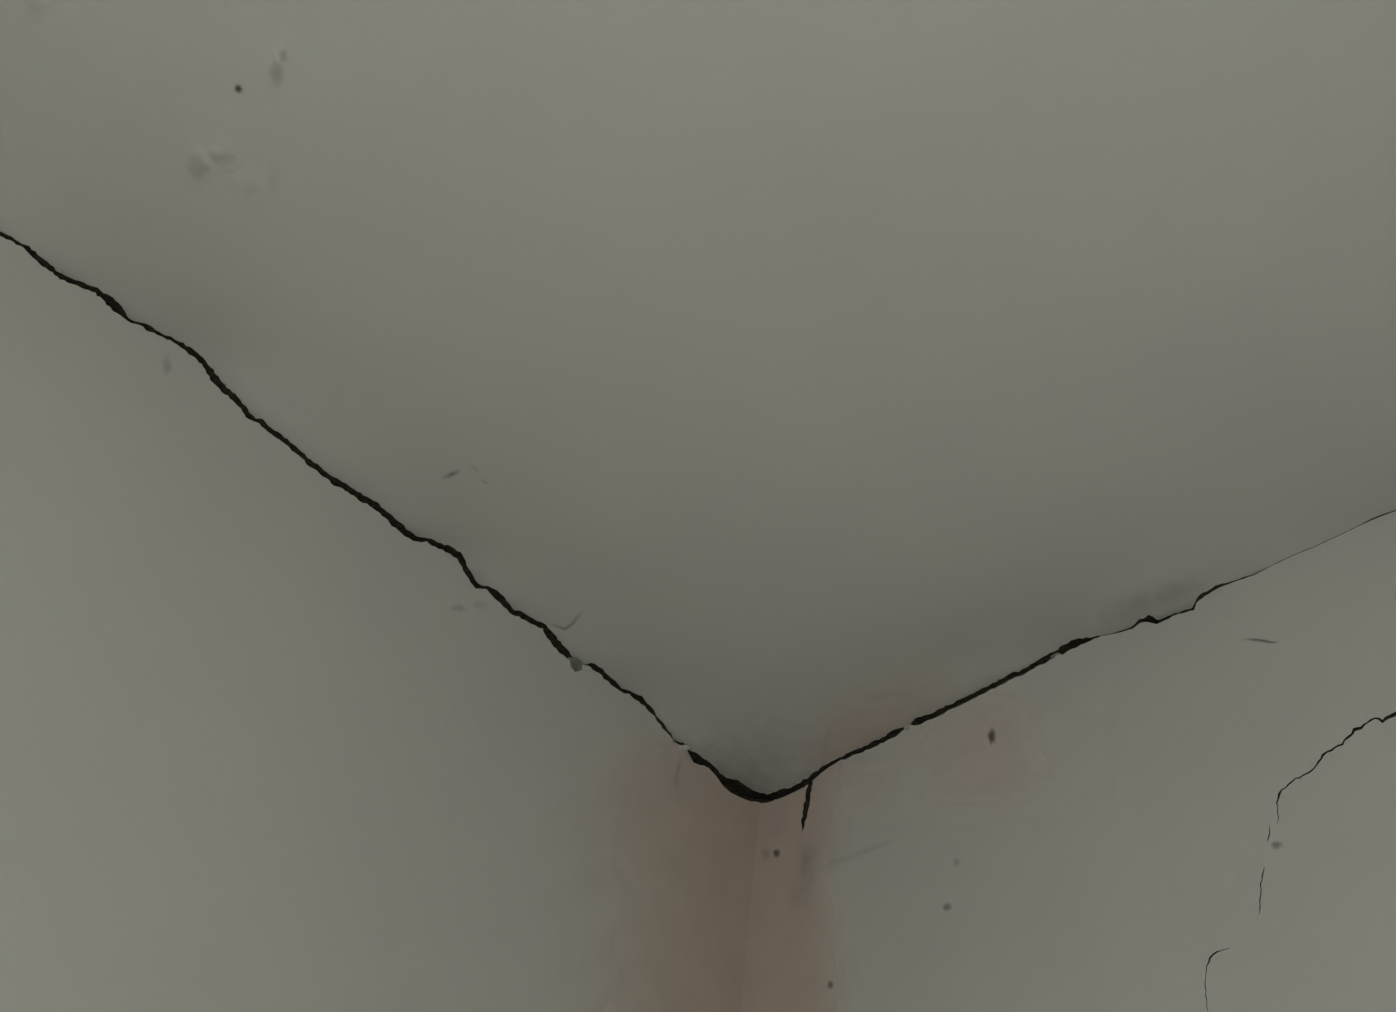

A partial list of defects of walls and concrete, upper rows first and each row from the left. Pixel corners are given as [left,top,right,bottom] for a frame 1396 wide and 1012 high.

crack [0,231,1396,833]
crack [1259,712,1396,914]
crack [1205,948,1229,1010]